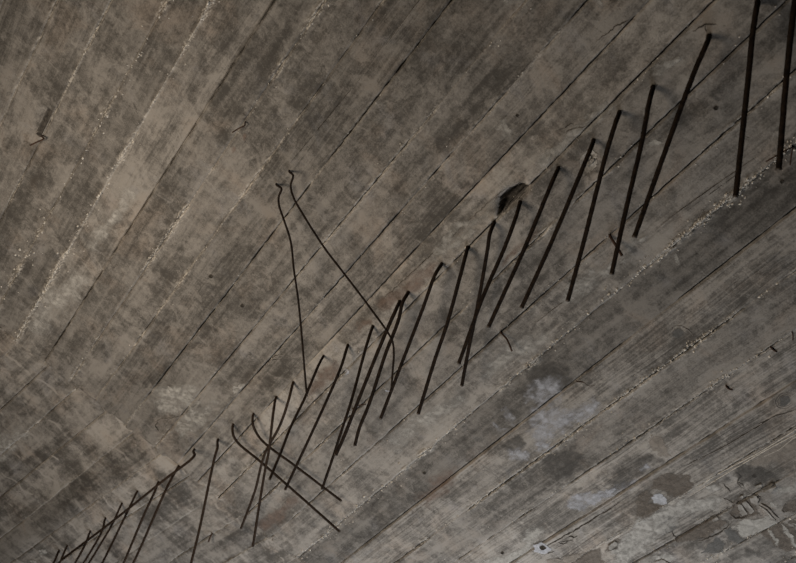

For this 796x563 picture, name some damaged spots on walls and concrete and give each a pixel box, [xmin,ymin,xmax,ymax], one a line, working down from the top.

spalling [231,290,411,547]
spalling [379,261,444,420]
spalling [417,245,470,415]
spalling [457,182,529,387]
spalling [487,165,561,328]
water stain [528,362,599,476]
spalling [519,109,623,309]
spalling [609,32,712,275]
spalling [732,0,762,198]
spalling [775,0,796,170]
spalling [53,448,196,563]
water stain [611,474,721,563]